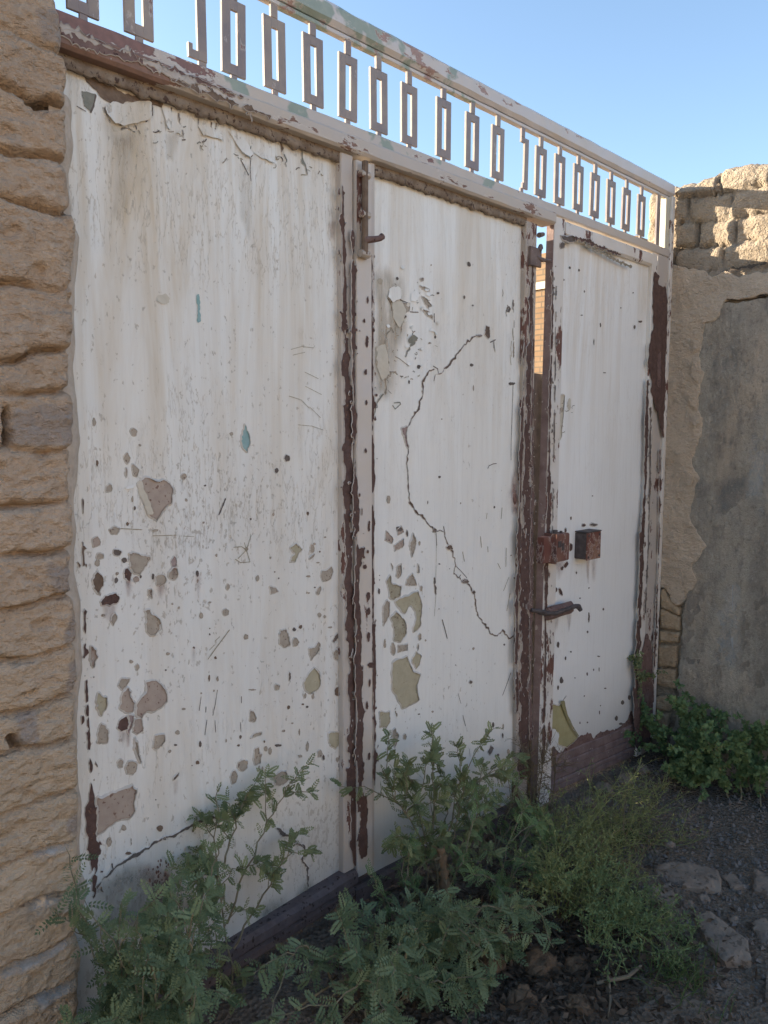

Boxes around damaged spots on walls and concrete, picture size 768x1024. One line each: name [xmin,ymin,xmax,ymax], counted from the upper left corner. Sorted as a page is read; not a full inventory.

peeling [77,91,253,177]
corrosion [76,541,87,568]
corrosion [82,609,94,661]
corrosion [80,675,177,926]
peeling [95,660,180,855]
peeling [91,427,188,637]
crack [96,811,229,889]
peeling [274,613,338,709]
corrosion [335,185,380,866]
peeling [378,525,434,749]
crack [400,325,514,640]
corrosion [512,265,668,780]